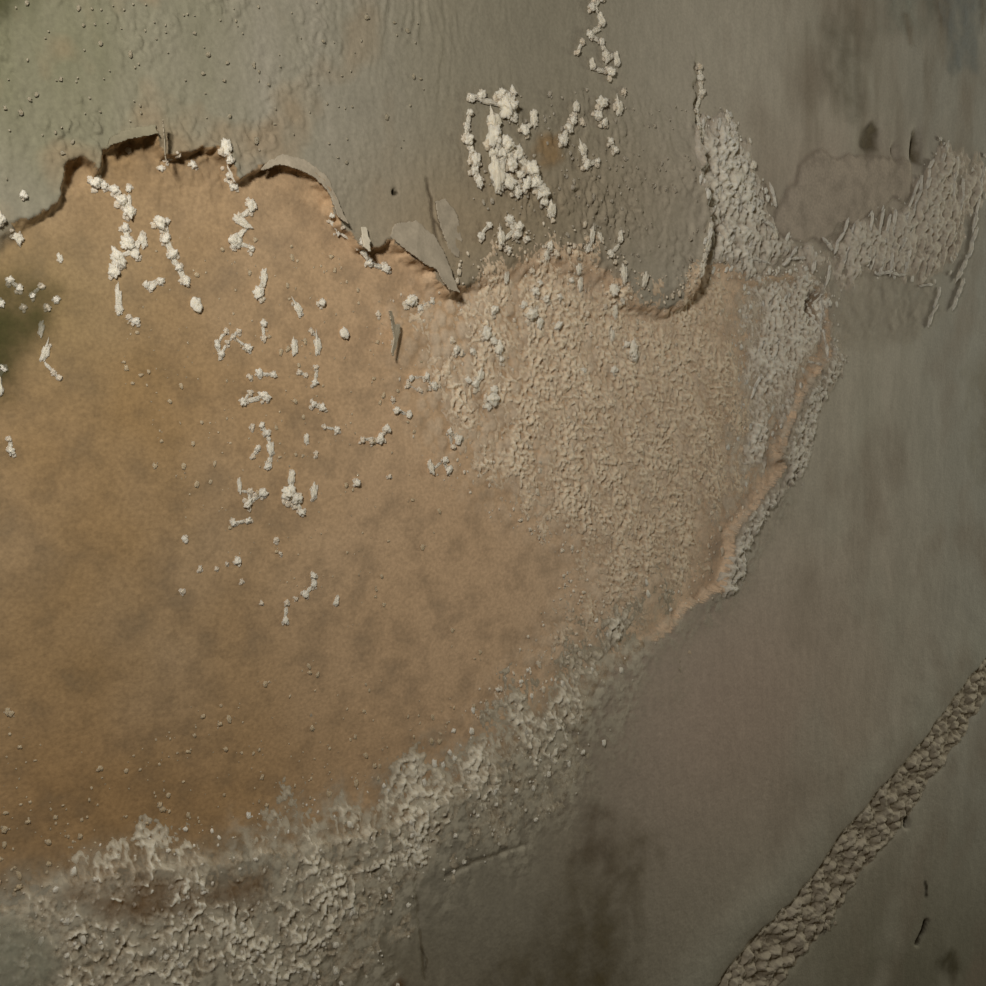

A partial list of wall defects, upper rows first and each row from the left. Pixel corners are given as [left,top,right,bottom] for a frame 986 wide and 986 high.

leakage [156,151,199,172]
spalling [861,123,876,150]
leakage [0,211,24,247]
leakage [87,175,207,339]
leakage [217,137,276,304]
leakage [326,212,392,274]
leakage [0,275,63,396]
leakage [5,436,17,458]
leakage [197,253,391,585]
flaking render [0,119,833,882]
leakage [280,570,334,626]
leakage [0,796,67,862]